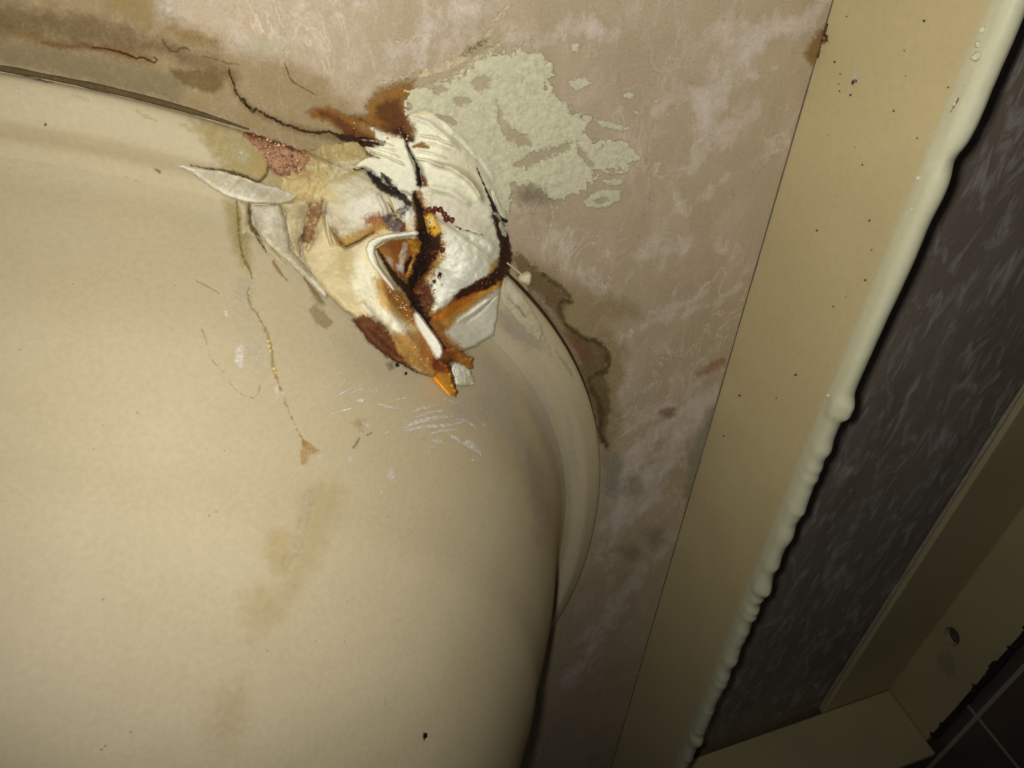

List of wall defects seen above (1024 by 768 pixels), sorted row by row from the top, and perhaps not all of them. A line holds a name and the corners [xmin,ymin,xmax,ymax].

leakage [0,0,346,152]
crack [13,28,347,142]
spalling [243,132,310,176]
crack [236,201,322,302]
corrosion [299,200,326,243]
corrosion [310,80,430,158]
corrosion [333,204,512,376]
peeling [583,178,626,209]
crack [248,298,300,435]
leakage [516,256,620,448]